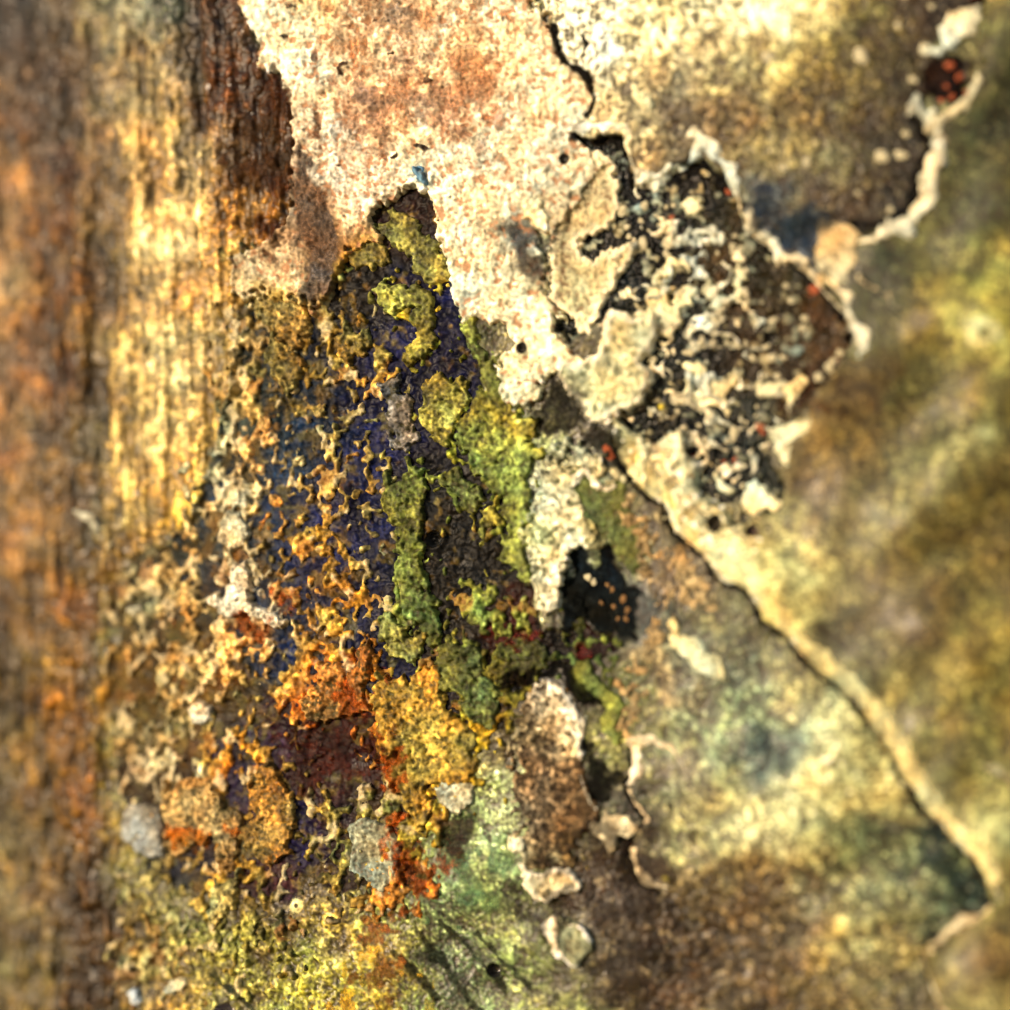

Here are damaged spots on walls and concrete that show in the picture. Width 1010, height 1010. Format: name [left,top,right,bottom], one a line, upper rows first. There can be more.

spalling [921,5,983,105]
peeling [227,0,863,529]
peeling [126,602,145,619]
peeling [206,509,289,629]
peeling [517,436,647,641]
peeling [188,699,215,725]
crack [614,430,1001,1010]
peeling [121,803,166,857]
peeling [347,817,402,892]
peeling [434,782,476,817]
peeling [506,679,642,970]
crack [979,763,1010,786]